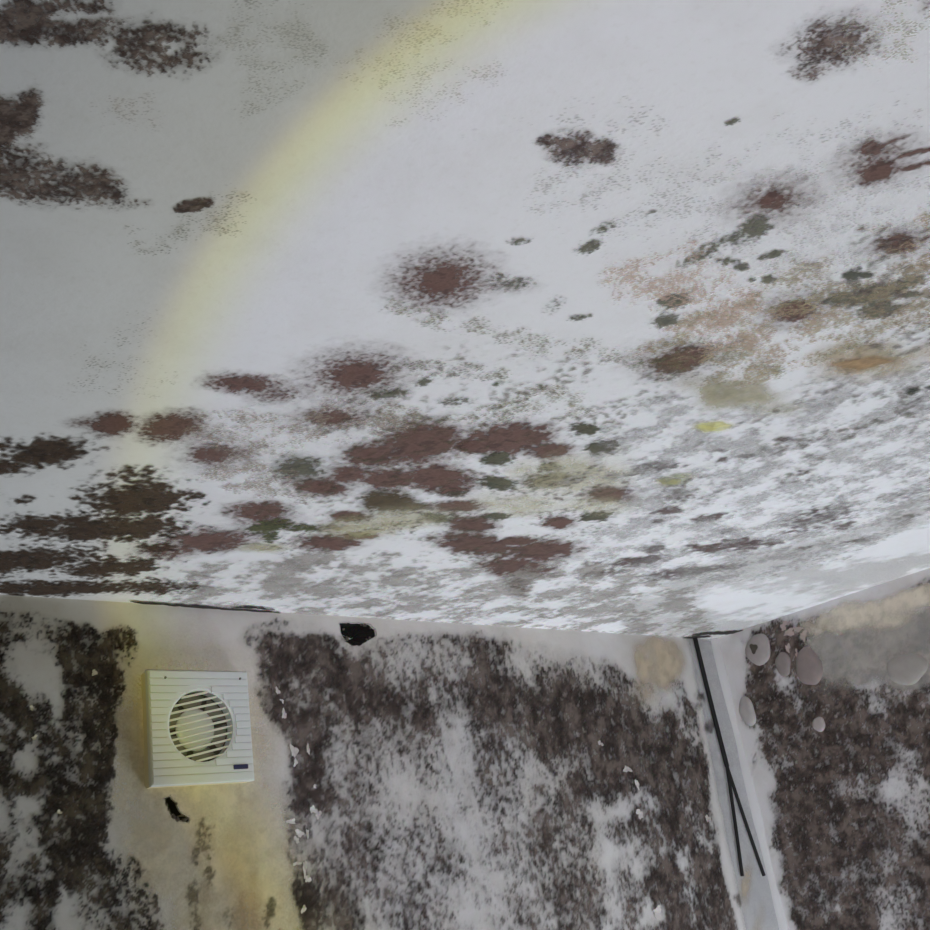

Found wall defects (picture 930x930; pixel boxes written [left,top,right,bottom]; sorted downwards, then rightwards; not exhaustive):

damp [788,1,930,80]
damp [0,89,148,206]
damp [537,131,617,167]
damp [840,135,930,186]
damp [173,195,246,231]
damp [579,223,615,254]
damp [390,251,529,330]
spalling [339,622,377,646]
damp [0,352,876,930]
damp [744,580,930,930]